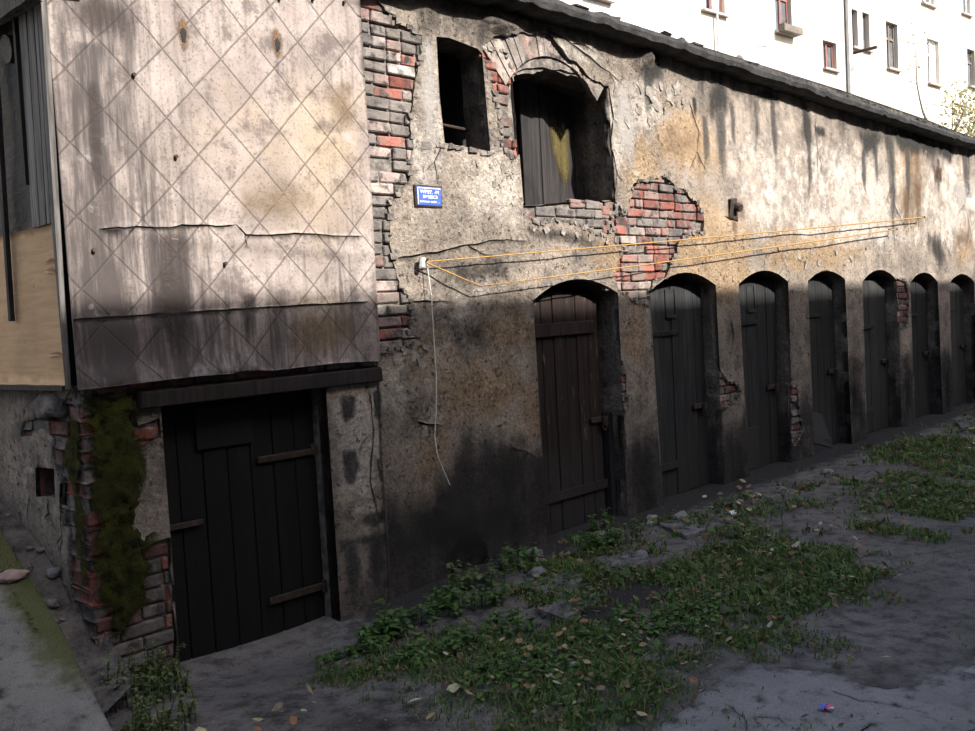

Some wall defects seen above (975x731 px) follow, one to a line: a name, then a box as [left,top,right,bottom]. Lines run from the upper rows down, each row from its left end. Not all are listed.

flaking render [360,0,432,371]
flaking render [475,20,604,188]
damp [693,77,735,167]
damp [755,88,778,149]
damp [803,107,825,180]
damp [860,128,973,214]
flaking render [523,174,706,305]
damp [928,233,944,266]
flaking render [889,277,910,328]
flaking render [24,389,174,680]